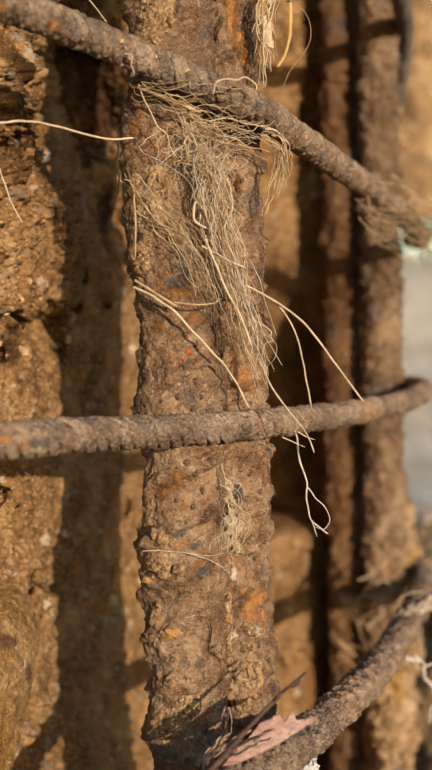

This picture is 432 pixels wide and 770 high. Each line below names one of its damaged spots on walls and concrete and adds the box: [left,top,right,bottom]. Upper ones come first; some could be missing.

spalling [161,0,260,90]
corrosion [226,0,247,63]
corrosion [306,0,323,105]
spalling [317,0,405,196]
spalling [118,70,272,416]
spalling [318,173,405,404]
corrosion [160,458,210,516]
corrosion [311,430,327,483]
spalling [322,412,409,690]
spalling [109,438,282,770]
corrosion [240,589,265,625]
corrosion [309,654,330,709]